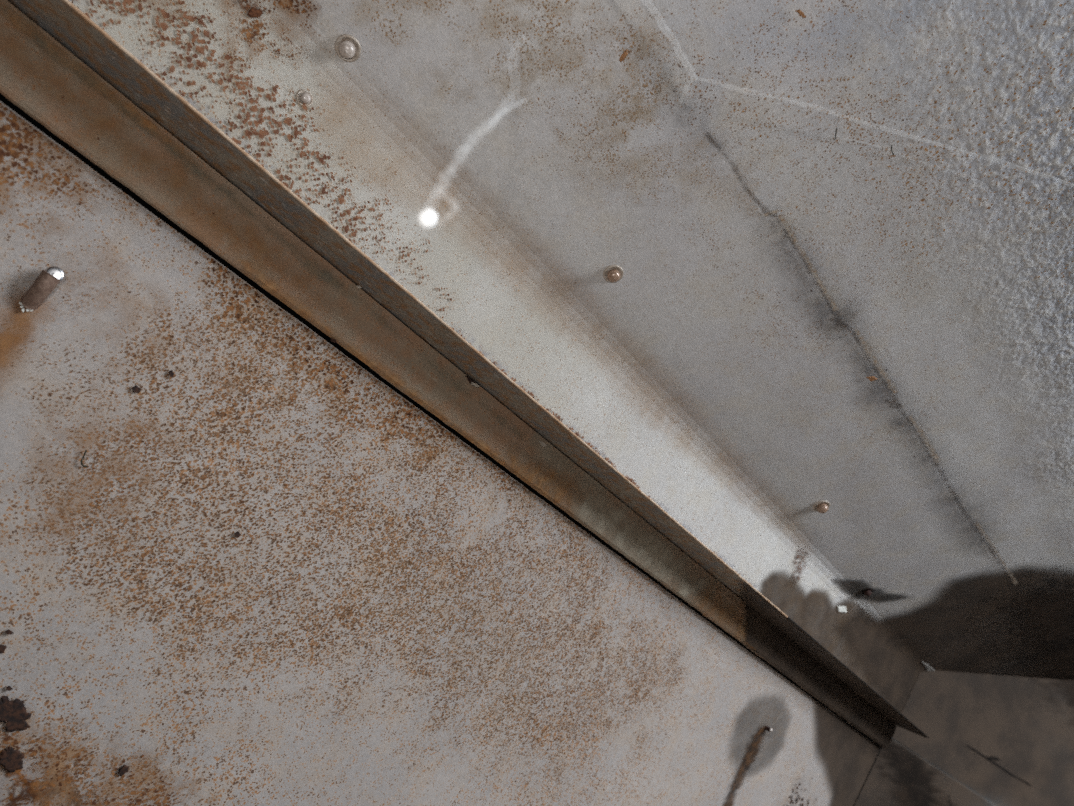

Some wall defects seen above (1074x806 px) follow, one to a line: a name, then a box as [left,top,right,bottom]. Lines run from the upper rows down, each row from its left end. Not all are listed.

corrosion [0,103,149,234]
corrosion [72,0,433,284]
corrosion [353,0,708,206]
corrosion [764,3,1074,302]
water stain [724,727,765,806]